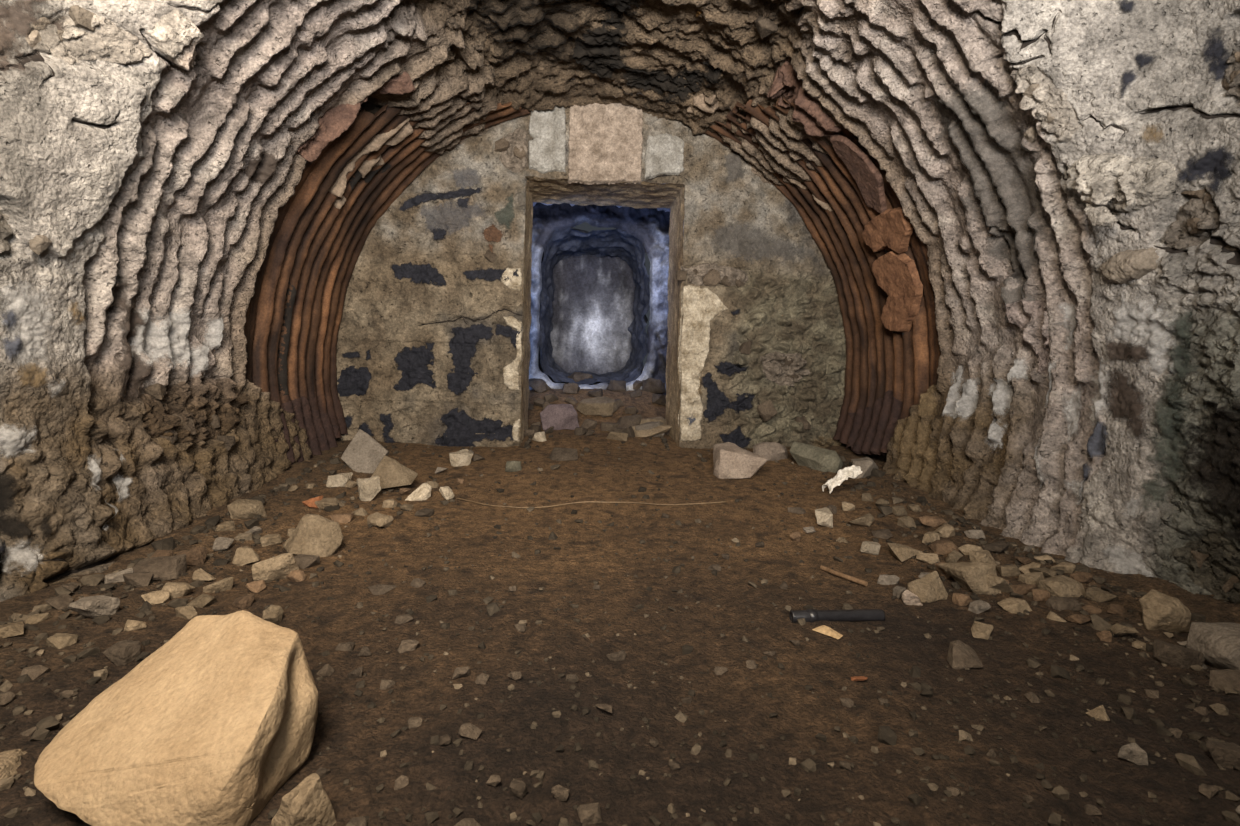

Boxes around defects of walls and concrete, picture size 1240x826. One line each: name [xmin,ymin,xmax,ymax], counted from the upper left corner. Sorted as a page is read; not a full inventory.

rust [296,71,416,163]
crack [1083,105,1240,136]
rust [862,207,923,332]
peeling [495,316,524,391]
peeling [676,262,748,441]
peeling [512,419,521,442]
water stain [943,360,1028,448]